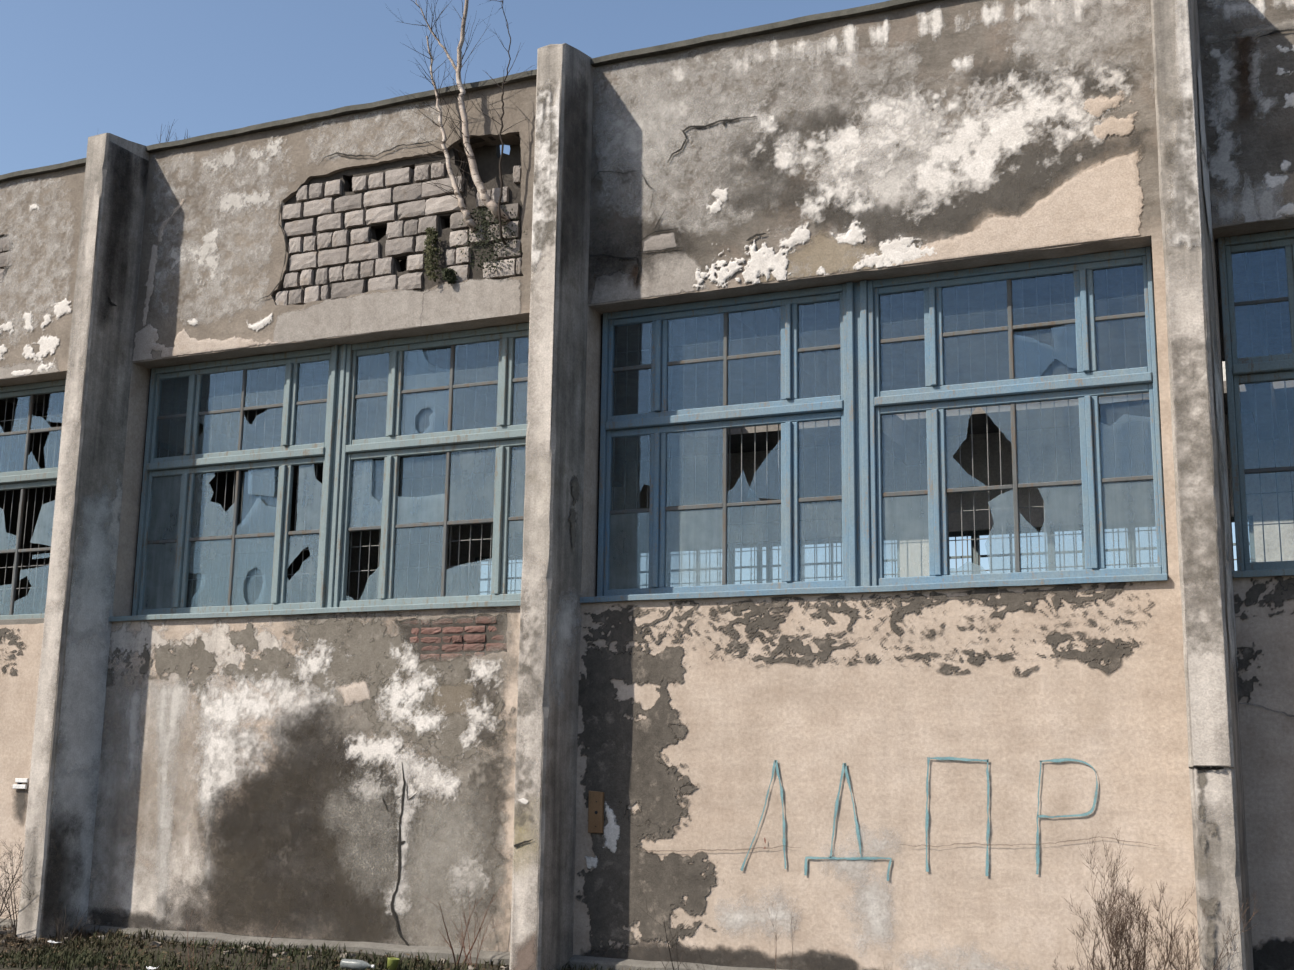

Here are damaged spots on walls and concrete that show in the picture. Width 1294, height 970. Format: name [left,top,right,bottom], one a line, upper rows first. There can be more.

spalling [534,122,559,249]
crack [589,116,757,283]
peeling [706,188,728,214]
peeling [831,221,921,269]
peeling [1262,160,1291,190]
peeling [0,298,72,379]
peeling [273,278,532,344]
peeling [1171,343,1294,851]
leakage [91,639,490,943]
leakage [460,659,501,748]
spalling [576,582,1154,951]
crack [382,765,417,946]